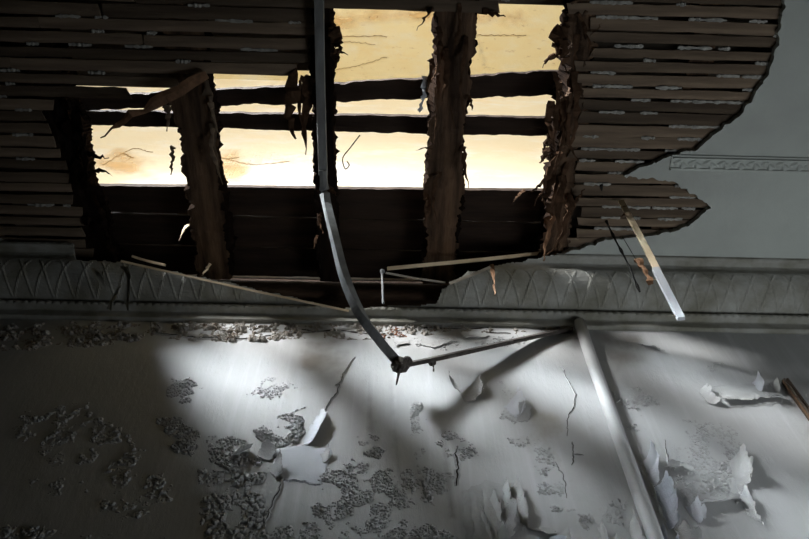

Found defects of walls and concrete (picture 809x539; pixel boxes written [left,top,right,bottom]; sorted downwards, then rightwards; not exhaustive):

crack [151,326,551,341]
peeling [374,324,527,351]
peeling [166,376,204,404]
peeling [246,377,298,400]
crack [325,357,356,410]
peeling [449,371,484,402]
peeling [699,372,789,408]
peeling [434,431,478,461]
crack [555,366,584,498]
peeling [156,402,459,539]
peeling [507,436,565,495]
peeling [547,498,646,539]